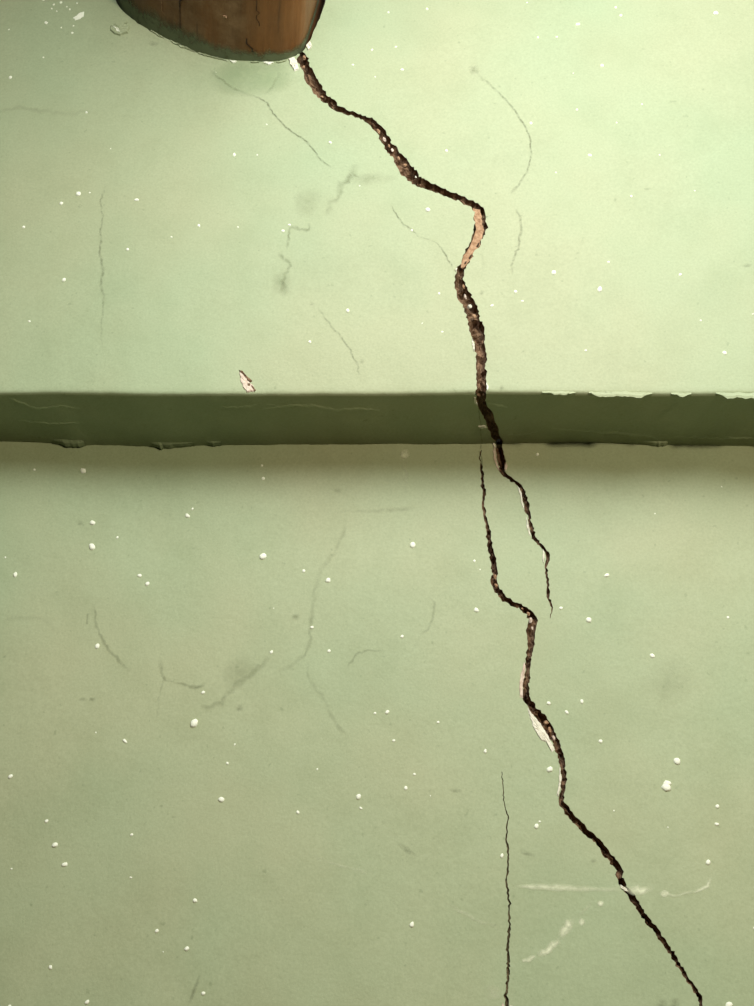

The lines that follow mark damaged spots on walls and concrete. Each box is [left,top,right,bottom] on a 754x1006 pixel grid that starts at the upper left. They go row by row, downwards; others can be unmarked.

spalling [239,370,256,393]
crack [297,52,703,1006]